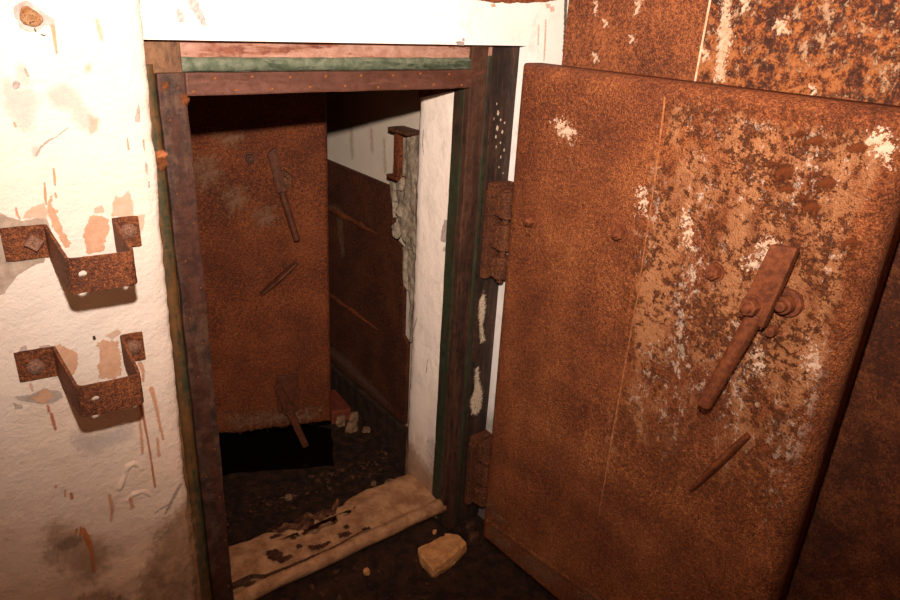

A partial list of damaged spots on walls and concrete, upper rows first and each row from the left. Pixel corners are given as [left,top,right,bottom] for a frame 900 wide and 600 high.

spalling [14,1,54,36]
rust [780,120,878,161]
rust [762,157,847,221]
peeling [0,196,71,295]
peeling [83,191,144,254]
spalling [389,135,419,342]
peeling [93,329,122,379]
rust [139,362,164,487]